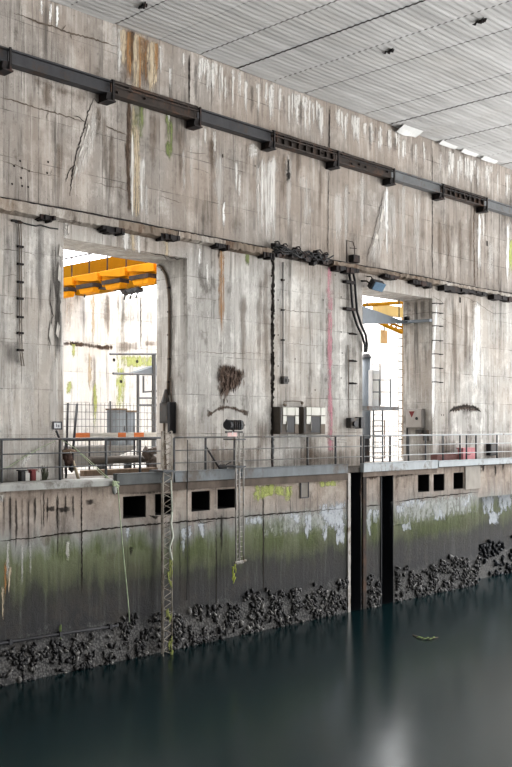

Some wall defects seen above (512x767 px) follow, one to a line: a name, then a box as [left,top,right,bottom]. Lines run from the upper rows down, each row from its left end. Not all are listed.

rust [118,29,161,89]
water stain [256,82,323,131]
crack [1,97,99,191]
water stain [251,144,276,228]
water stain [181,523,205,550]
water stain [246,504,345,545]
water stain [367,509,379,535]
water stain [396,494,472,531]
water stain [482,494,512,524]